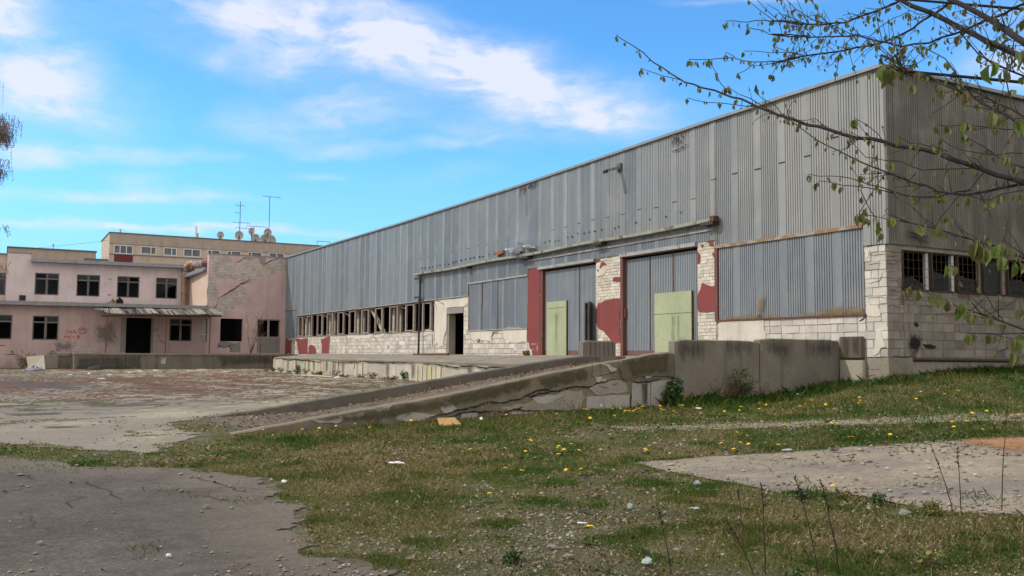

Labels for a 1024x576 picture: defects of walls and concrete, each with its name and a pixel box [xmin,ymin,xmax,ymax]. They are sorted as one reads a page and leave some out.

peeling [207,254,287,308]
peeling [285,296,469,354]
peeling [596,298,620,343]
peeling [697,283,715,312]
crack [424,364,661,419]